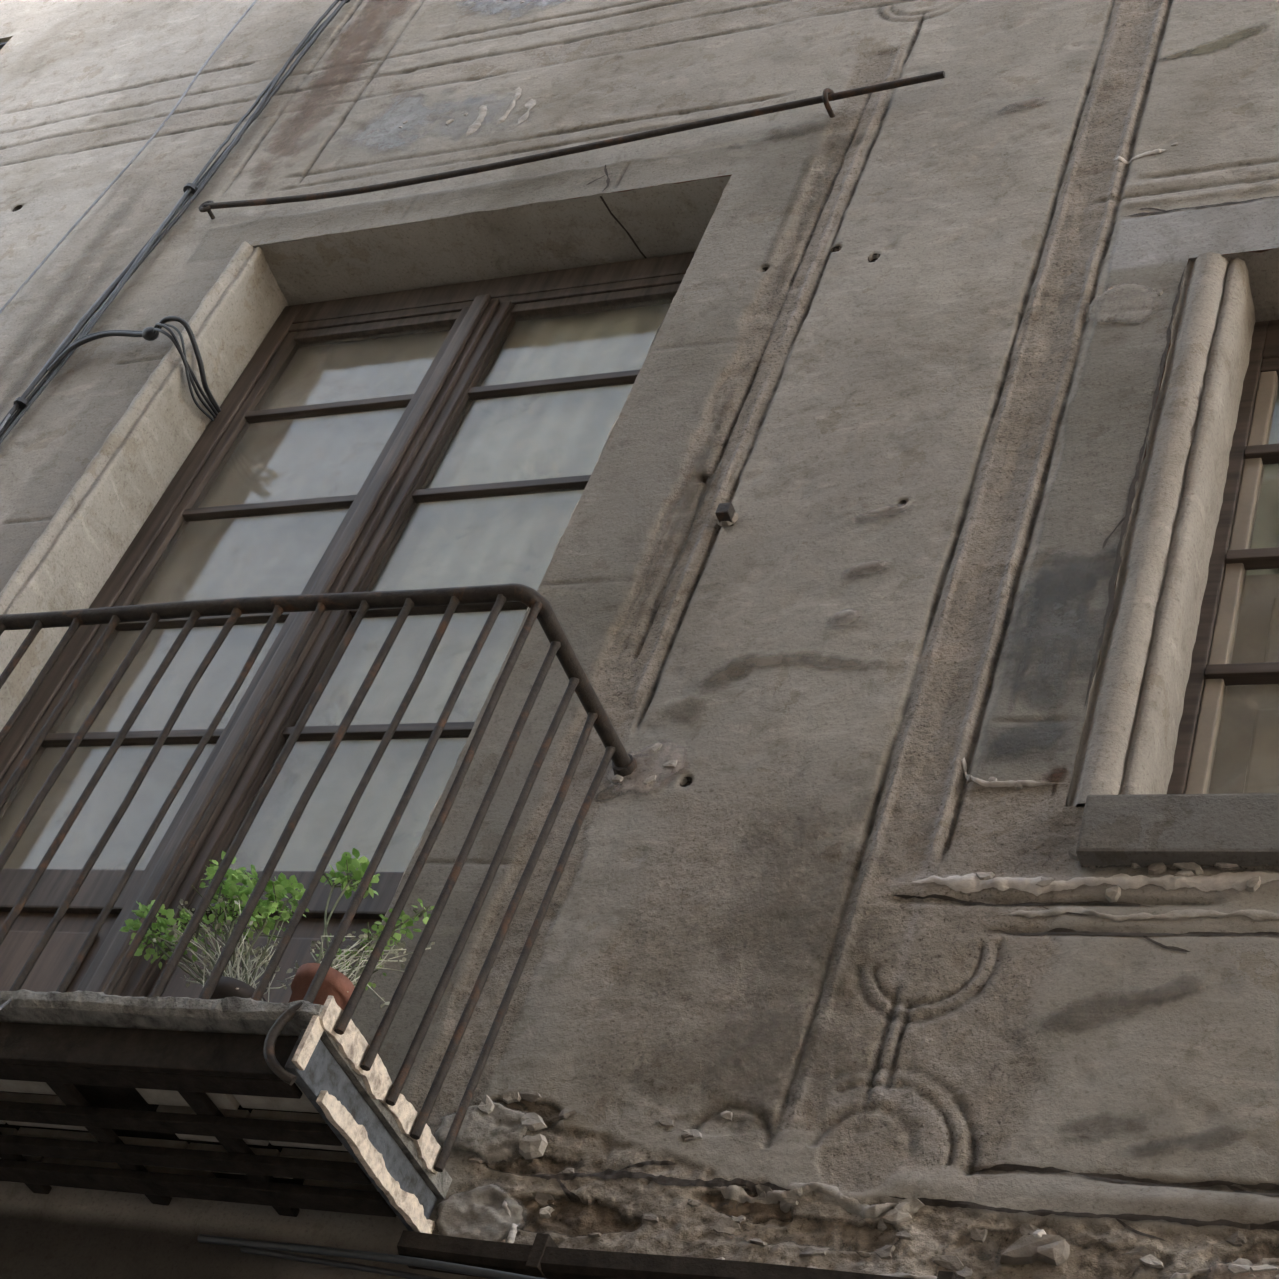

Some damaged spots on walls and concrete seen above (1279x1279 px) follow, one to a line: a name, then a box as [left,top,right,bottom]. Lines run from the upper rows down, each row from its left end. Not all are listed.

spalling [909,848,1279,921]
spalling [468,1090,582,1176]
spalling [658,1117,702,1143]
spalling [517,1191,659,1238]
spalling [687,1182,925,1269]
spalling [880,1224,1279,1279]